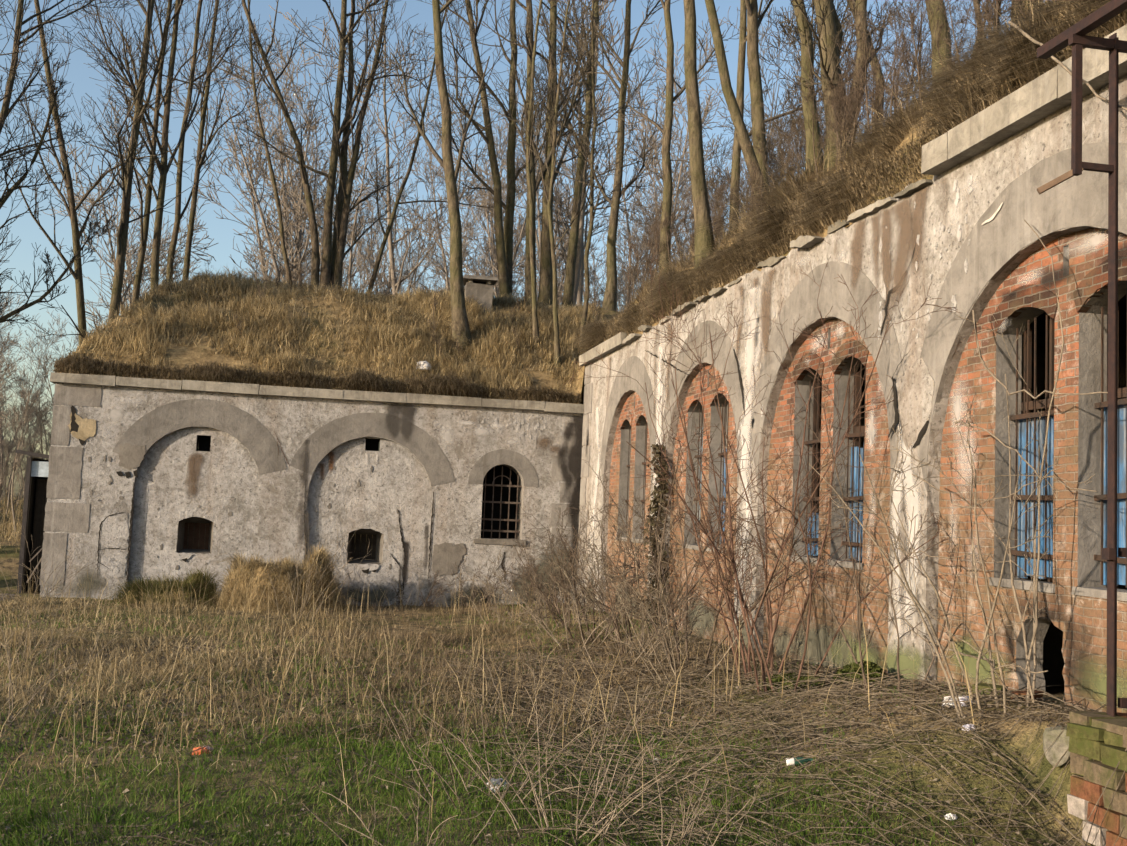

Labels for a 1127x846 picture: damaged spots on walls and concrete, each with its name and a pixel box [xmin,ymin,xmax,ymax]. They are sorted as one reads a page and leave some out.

damp [851,188,927,322]
crack [880,243,916,335]
peeling [68,405,149,578]
damp [387,405,415,439]
damp [558,407,600,558]
damp [654,324,673,445]
crack [884,352,928,572]
damp [893,425,919,617]